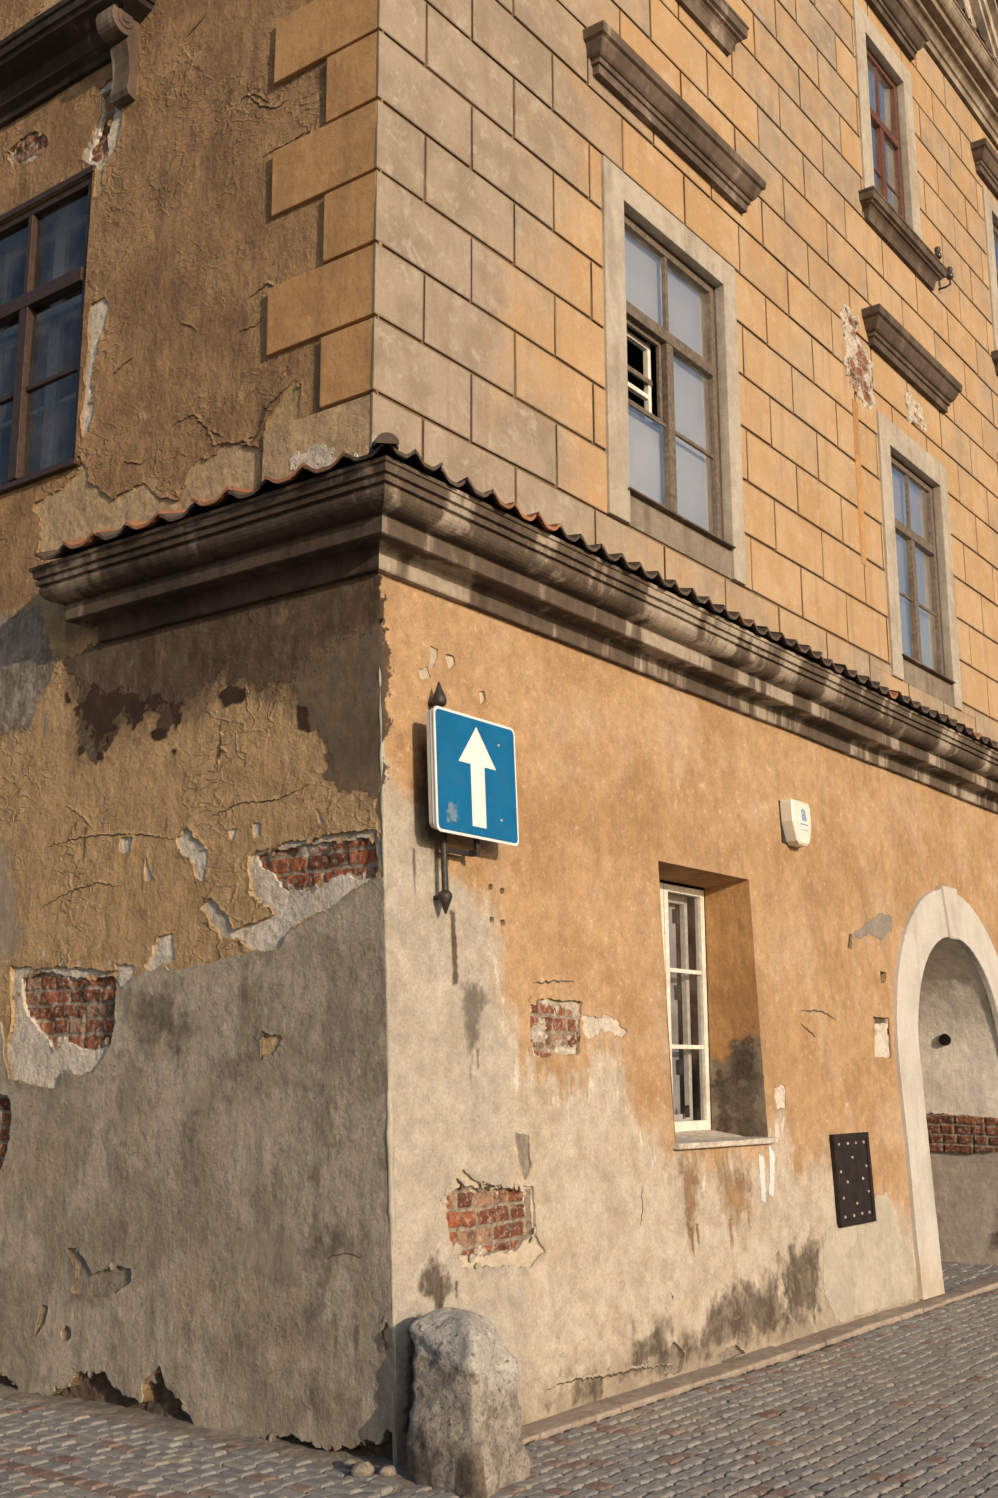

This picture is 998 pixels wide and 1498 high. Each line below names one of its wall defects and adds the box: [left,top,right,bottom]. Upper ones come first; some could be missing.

flaking render [91,92,115,197]
flaking render [839,304,877,410]
crack [172,379,294,447]
flaking render [15,968,120,1051]
flaking render [530,995,583,1061]
damp [712,1034,764,1137]
flaking render [0,1093,12,1170]
flaking render [926,1112,998,1154]
flaking render [441,1132,544,1272]
spalling [70,1246,132,1303]
damp [620,1242,821,1380]
damp [574,1376,602,1404]